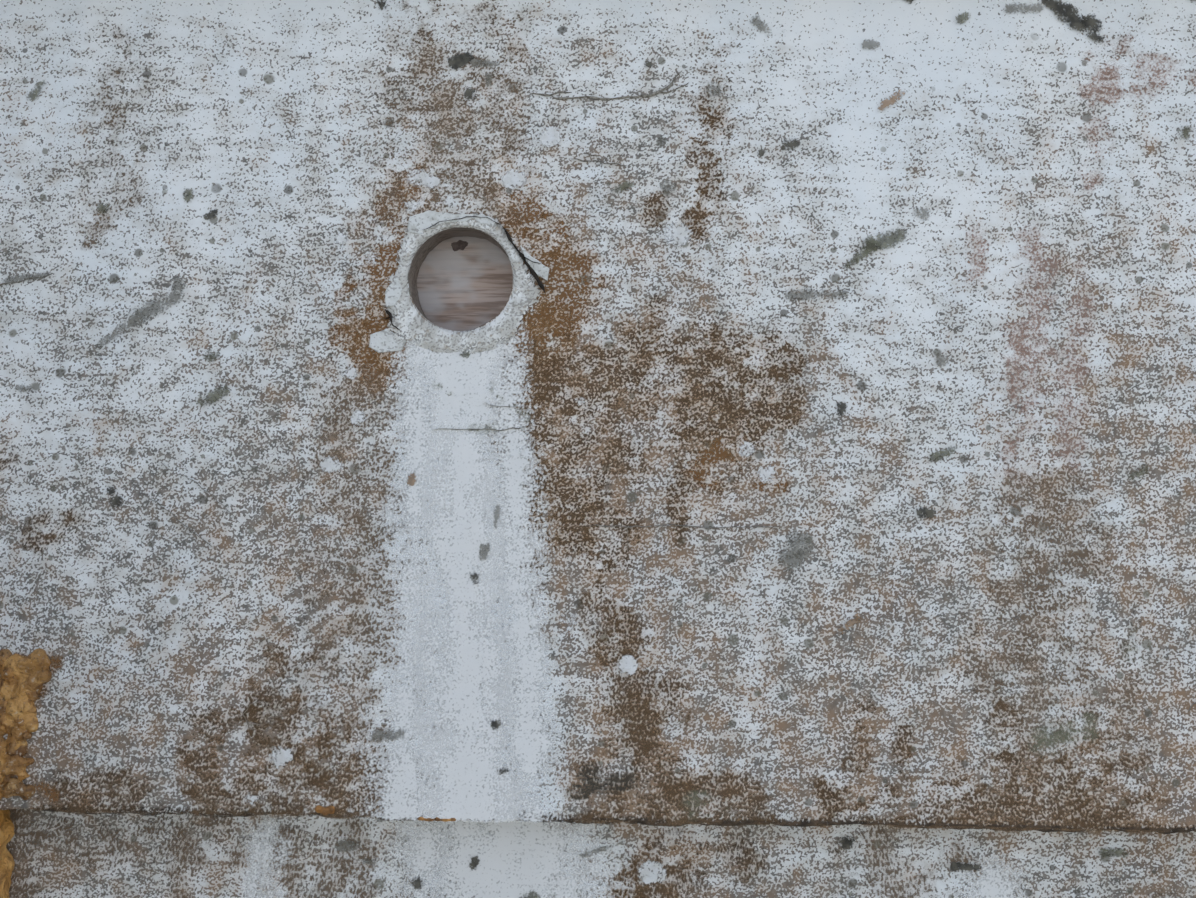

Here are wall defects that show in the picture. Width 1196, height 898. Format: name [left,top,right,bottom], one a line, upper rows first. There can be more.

crack [423,216,545,293]
damp [351,322,617,898]
damp [1033,714,1096,756]
damp [567,764,635,800]